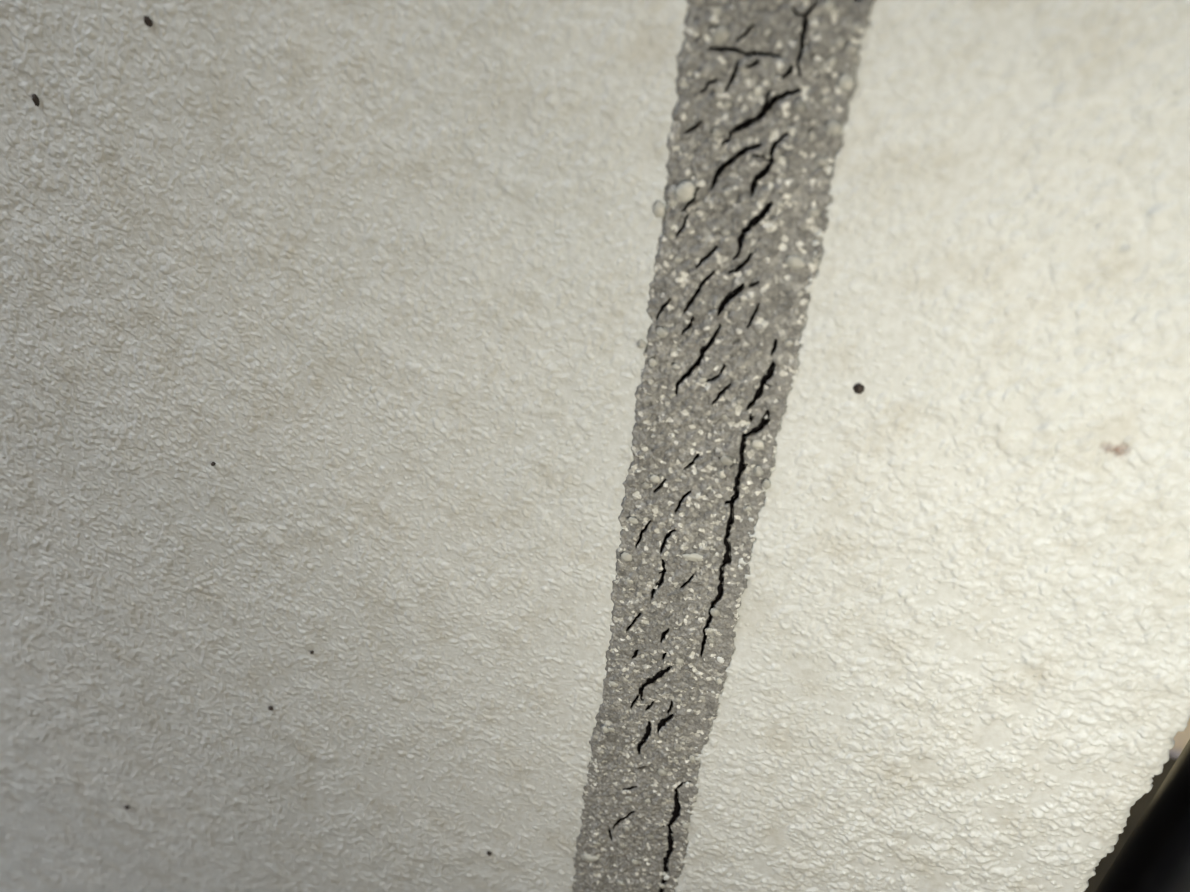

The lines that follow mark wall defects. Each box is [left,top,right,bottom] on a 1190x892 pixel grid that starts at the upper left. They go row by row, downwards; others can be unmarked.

crack [660,781,690,892]
crack [608,2,816,840]